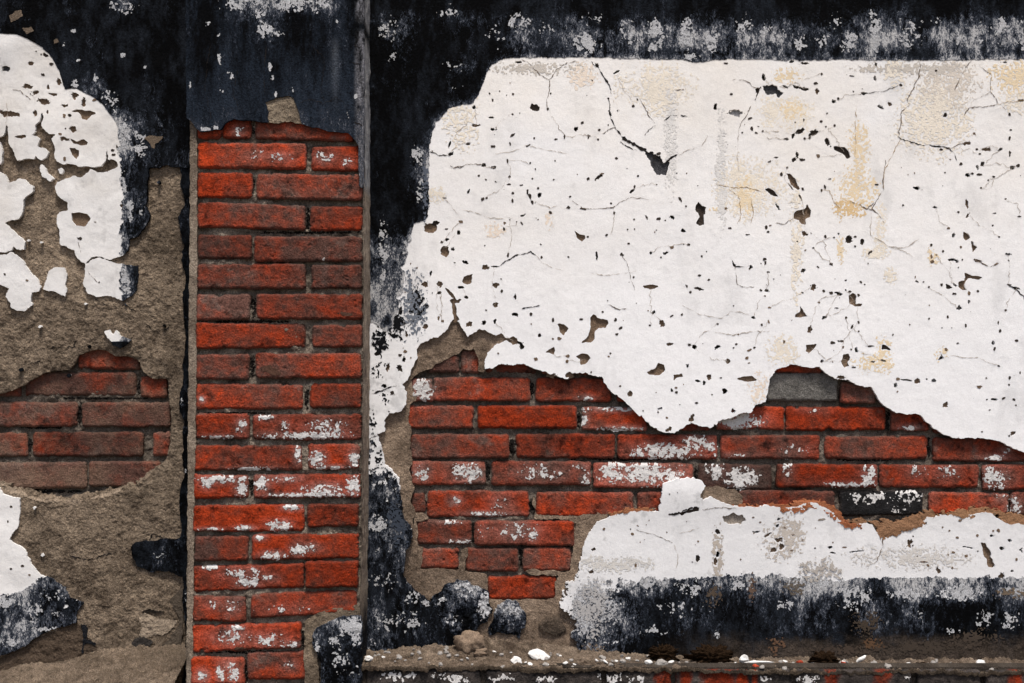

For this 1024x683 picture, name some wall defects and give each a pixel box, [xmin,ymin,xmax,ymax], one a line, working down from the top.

peeling [72,212,91,240]
spalling [23,51,163,222]
crack [431,60,706,348]
crack [717,65,1009,264]
crack [955,61,1022,114]
spalling [0,349,183,507]
efflorescence [197,414,360,587]
spalling [185,62,1024,683]
crack [684,261,879,362]
water stain [825,464,923,513]
water stain [978,448,1022,514]
efflorescence [218,624,297,648]